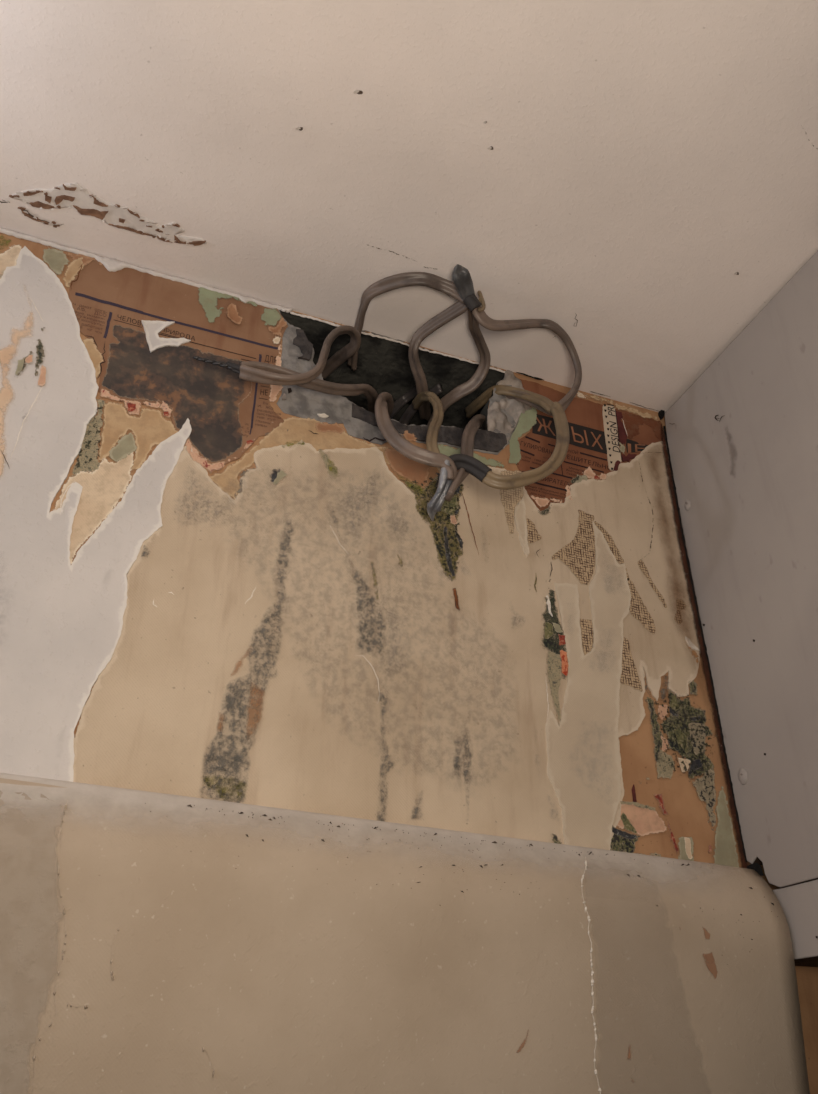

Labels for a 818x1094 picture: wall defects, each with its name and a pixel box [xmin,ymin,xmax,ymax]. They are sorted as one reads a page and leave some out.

peeling [5,183,207,246]
spalling [0,228,519,455]
water stain [406,477,461,572]
water stain [354,573,385,653]
water stain [202,523,292,803]